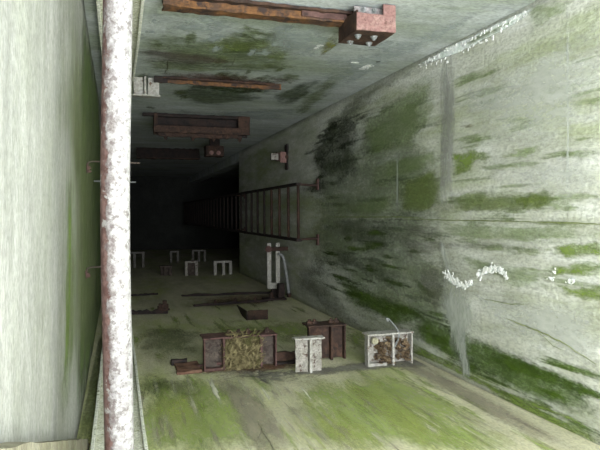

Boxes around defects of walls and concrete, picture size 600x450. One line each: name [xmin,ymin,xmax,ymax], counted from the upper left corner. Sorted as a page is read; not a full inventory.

water stain [418,9,531,69]
water stain [441,78,454,188]
water stain [415,290,600,438]